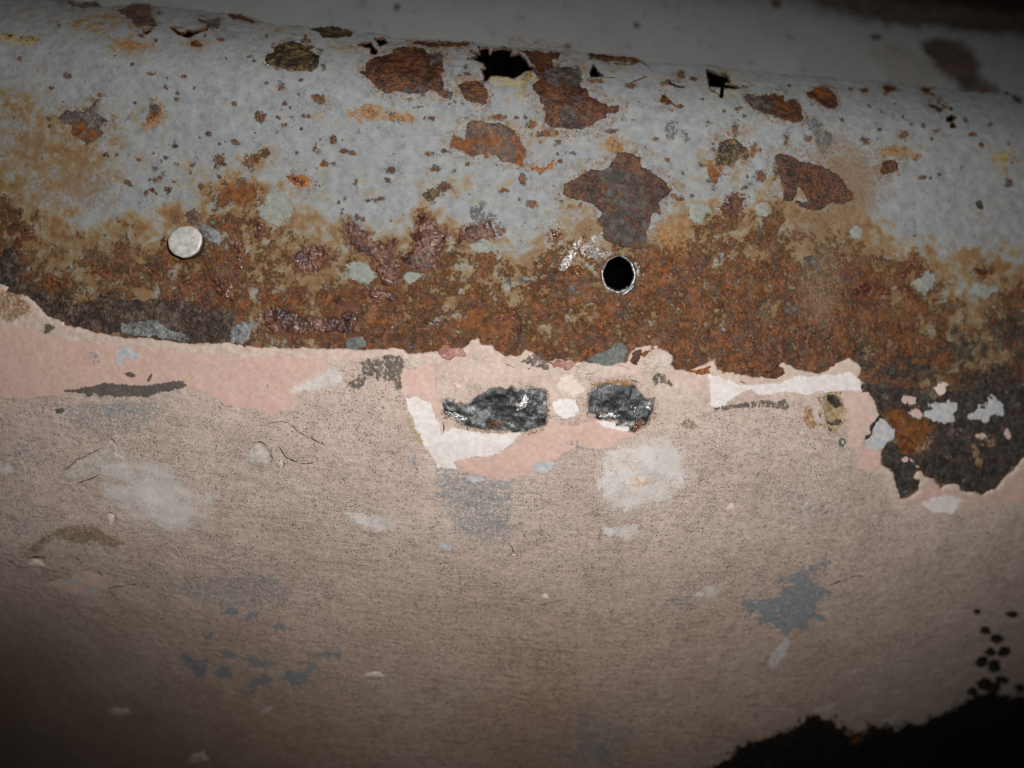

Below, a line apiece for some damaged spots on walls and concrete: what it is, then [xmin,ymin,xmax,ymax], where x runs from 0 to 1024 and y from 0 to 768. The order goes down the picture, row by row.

corrosion [346,36,693,267]
corrosion [702,83,868,225]
corrosion [0,180,273,344]
corrosion [258,185,508,342]
peeling [120,320,190,342]
peeling [229,321,254,344]
peeling [345,336,367,350]
peeling [588,342,629,366]
corrosion [630,346,675,365]
corrosion [761,366,785,379]
spalling [440,386,551,436]
spalling [586,379,658,436]